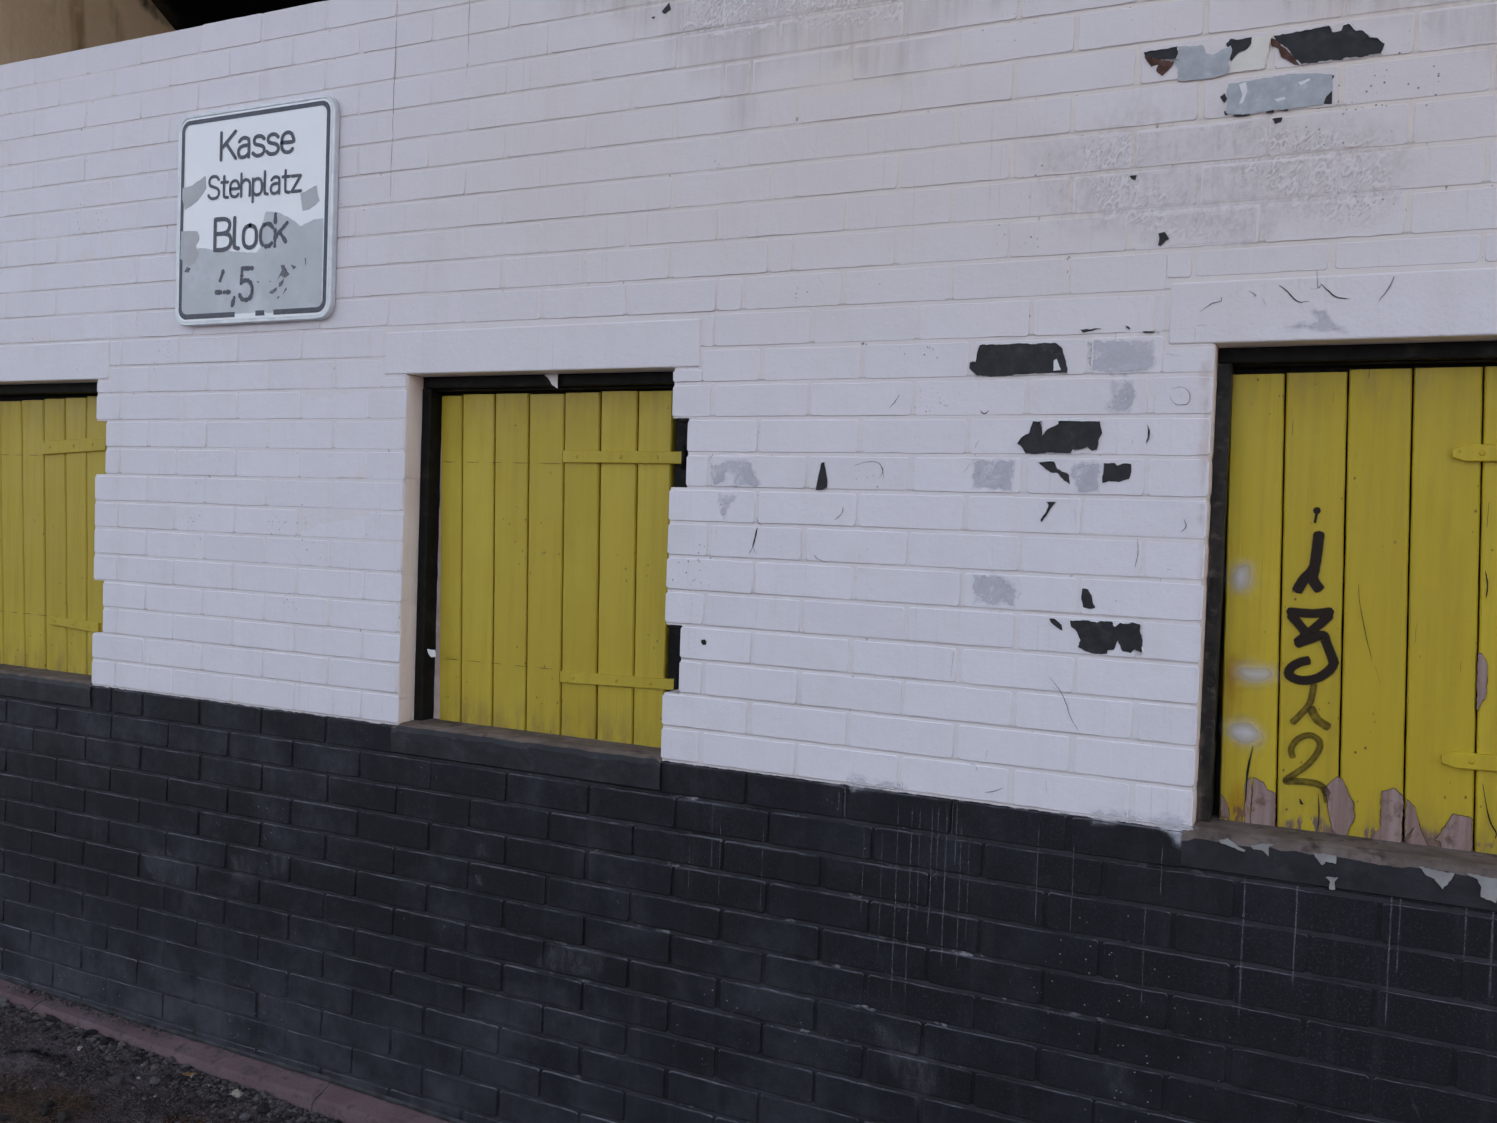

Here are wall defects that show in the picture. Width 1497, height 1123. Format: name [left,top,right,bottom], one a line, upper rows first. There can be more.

peeling [1144,23,1384,124]
peeling [969,342,1068,377]
peeling [974,419,1131,491]
peeling [1049,588,1144,654]
peeling [1476,653,1488,710]
damp [1094,813,1189,843]
peeling [1219,777,1276,856]
peeling [1322,776,1355,835]
peeling [1373,788,1473,851]
flaking render [1314,853,1338,890]
flaking render [1420,867,1497,903]